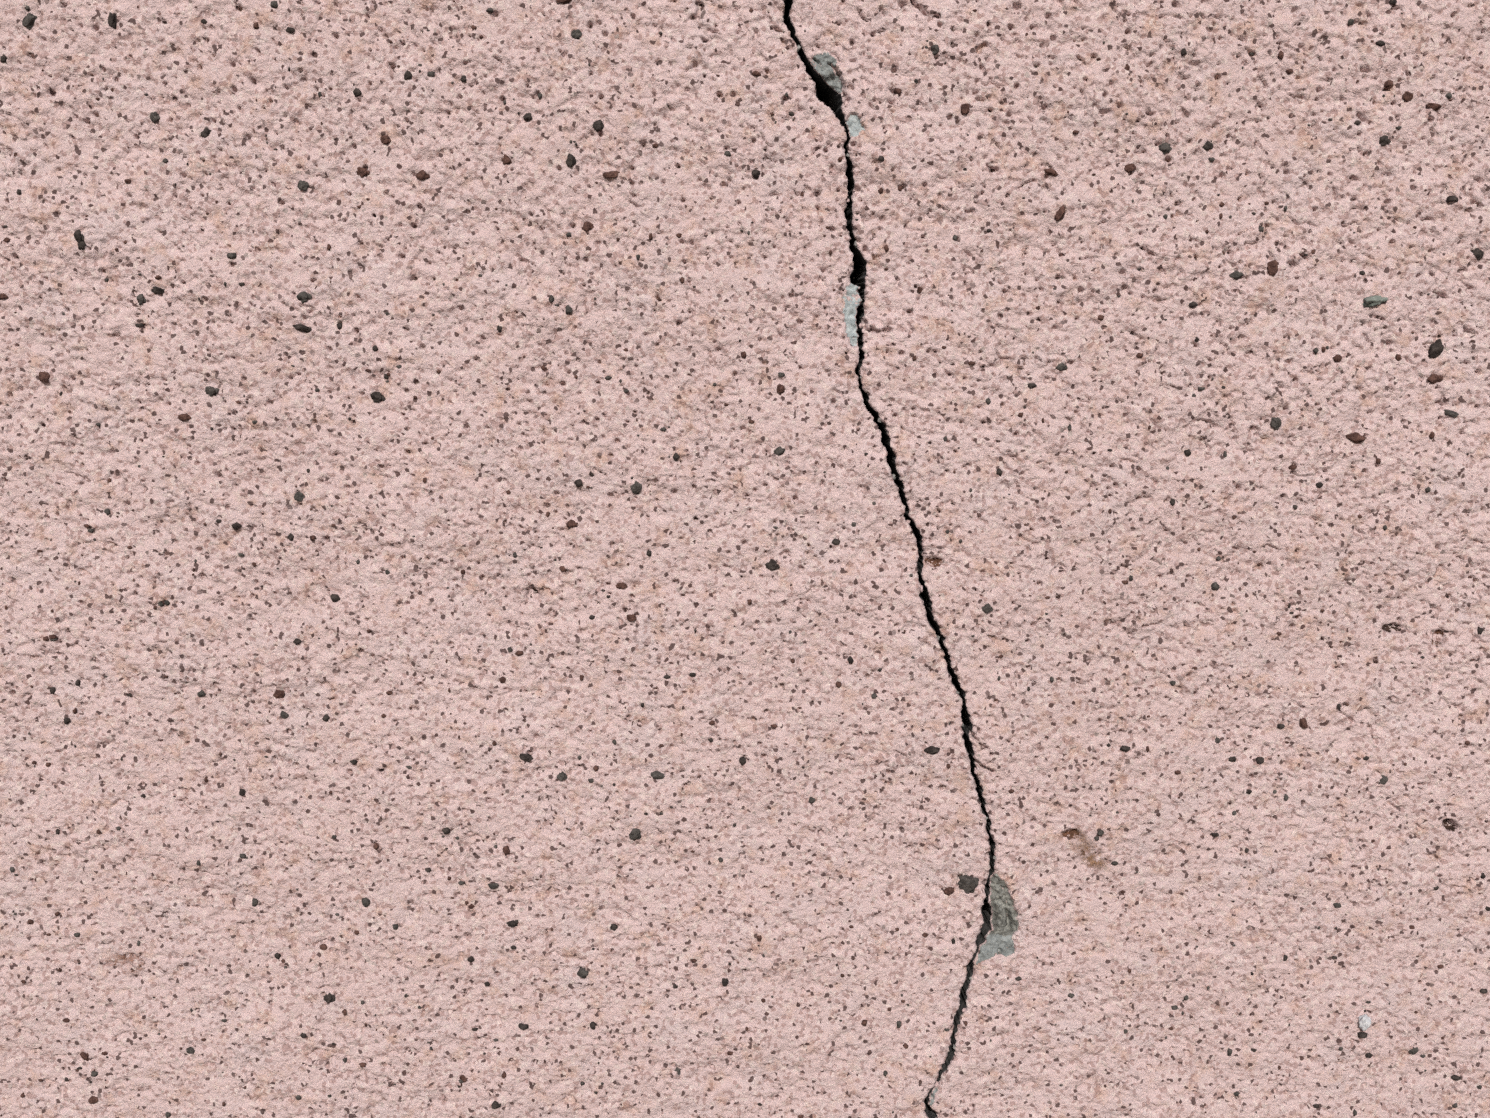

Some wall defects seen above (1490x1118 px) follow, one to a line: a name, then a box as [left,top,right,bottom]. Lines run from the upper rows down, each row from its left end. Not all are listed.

crack [783,0,996,1118]